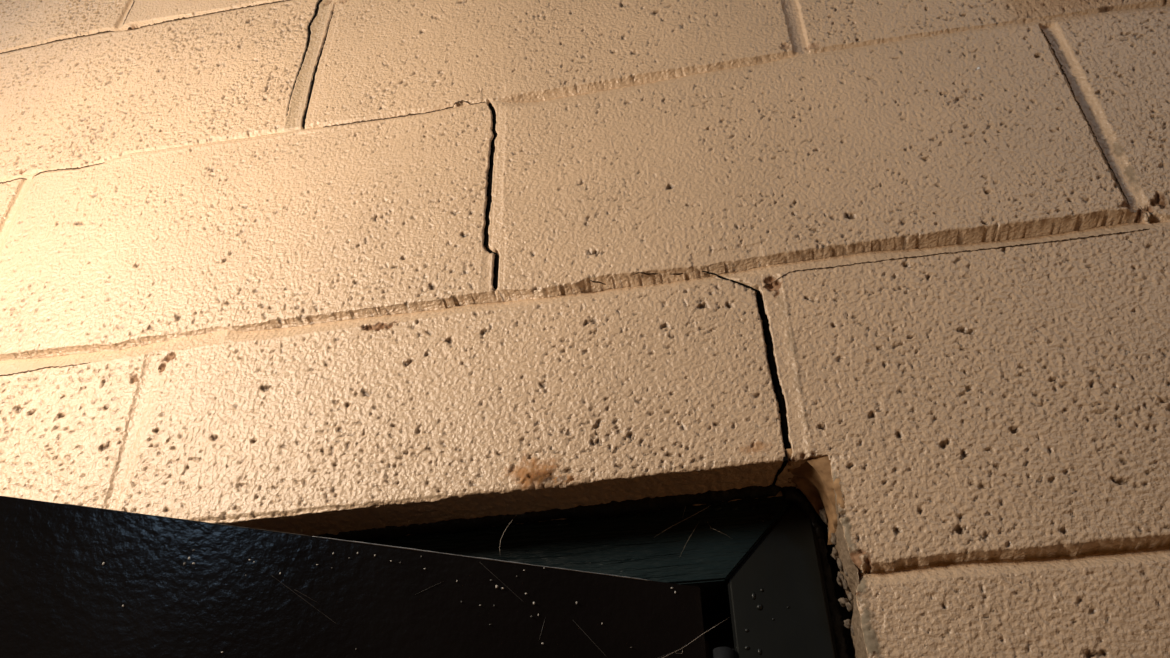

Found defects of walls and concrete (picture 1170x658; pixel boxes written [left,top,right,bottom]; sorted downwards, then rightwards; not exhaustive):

crack [0,0,499,290]
crack [633,29,1148,485]